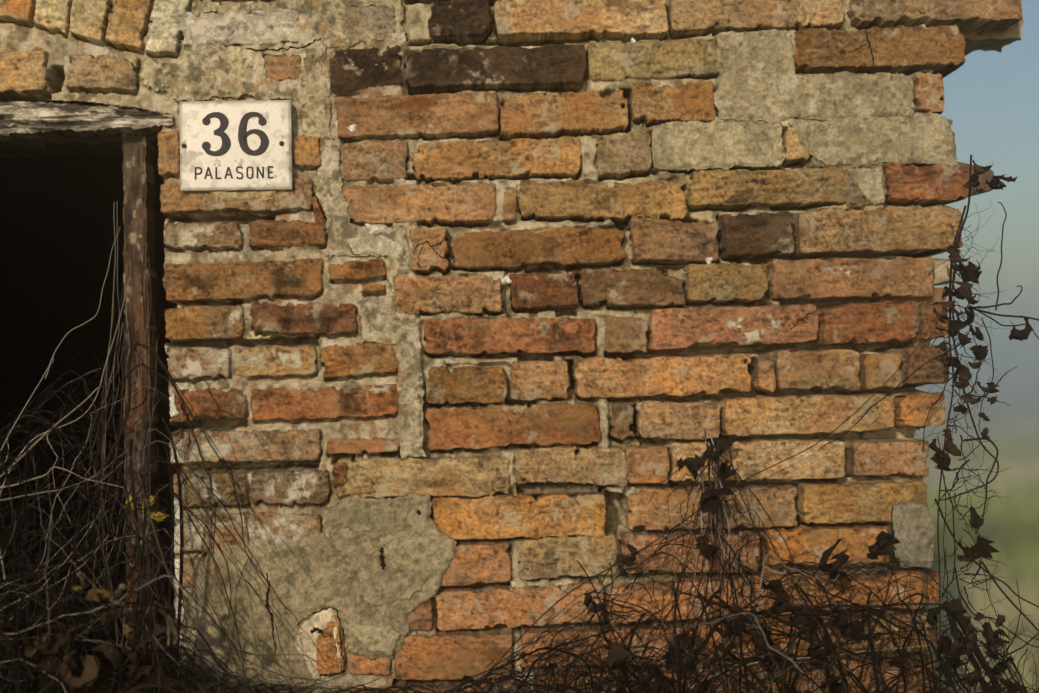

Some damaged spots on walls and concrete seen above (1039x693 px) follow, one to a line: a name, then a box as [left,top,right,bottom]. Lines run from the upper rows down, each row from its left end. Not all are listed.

crack [265,573,276,655]
flaking render [245,492,457,679]